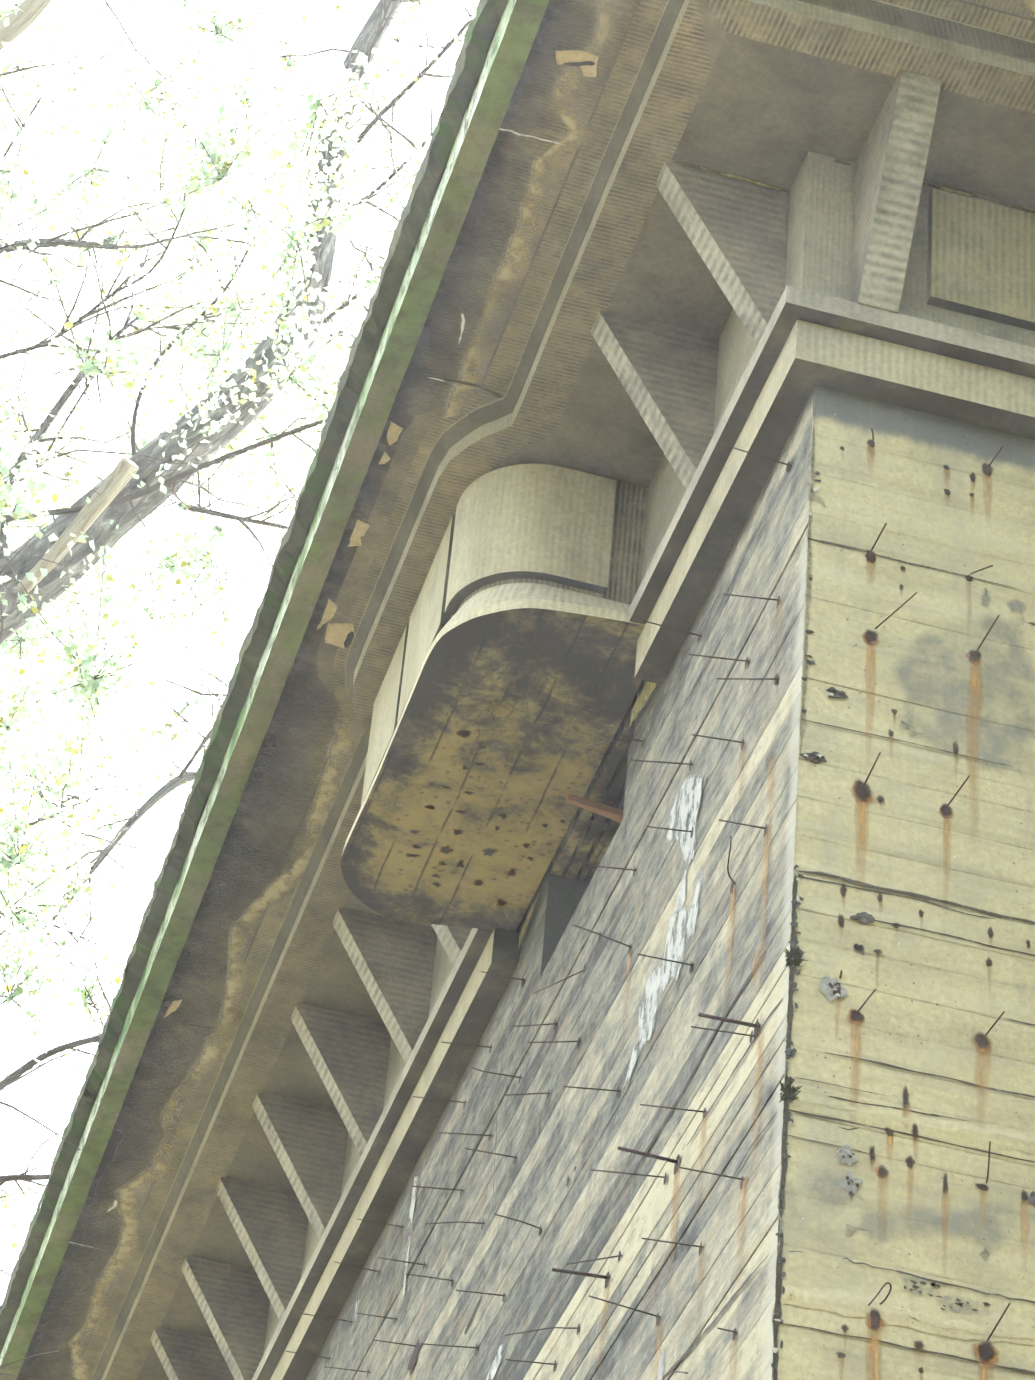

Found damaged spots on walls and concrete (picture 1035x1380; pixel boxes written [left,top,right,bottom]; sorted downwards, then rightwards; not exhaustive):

water stain [441,2,610,419]
water stain [16,0,566,1380]
rust [863,630,878,687]
rust [967,651,980,720]
rust [853,780,884,844]
rust [940,804,953,853]
spalling [819,976,848,1002]
rust [848,1010,864,1063]
rust [973,1034,991,1054]
spalling [837,1145,863,1195]
rust [867,1309,884,1380]
rust [974,1342,998,1380]